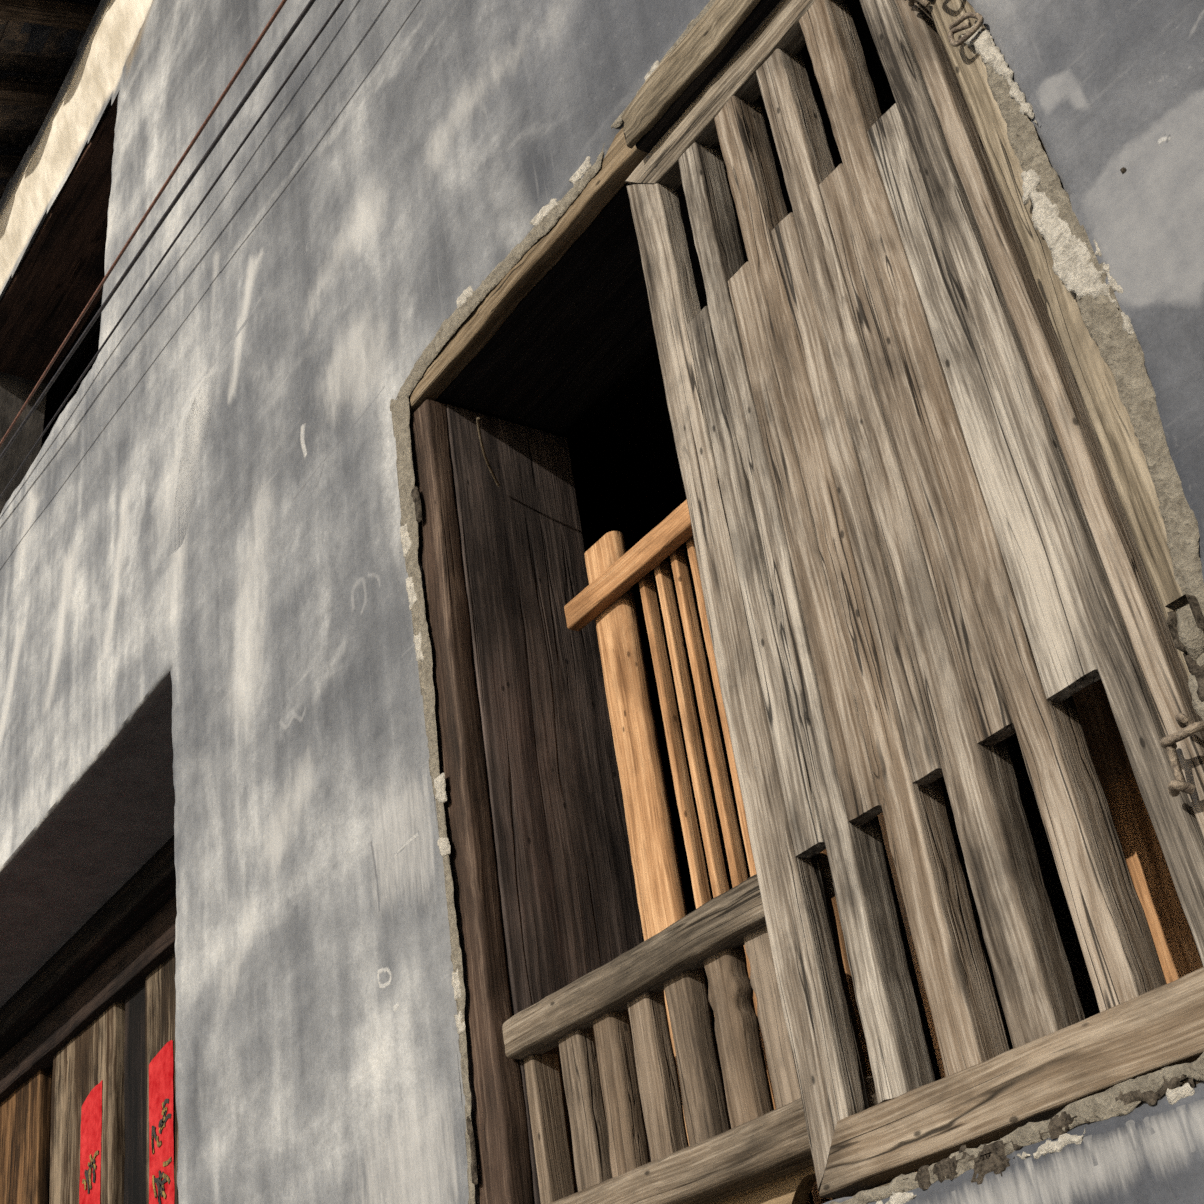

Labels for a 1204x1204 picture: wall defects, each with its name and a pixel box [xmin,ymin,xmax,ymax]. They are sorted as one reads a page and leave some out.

peeling [961,20,1204,721]
spalling [829,1052,1204,1204]